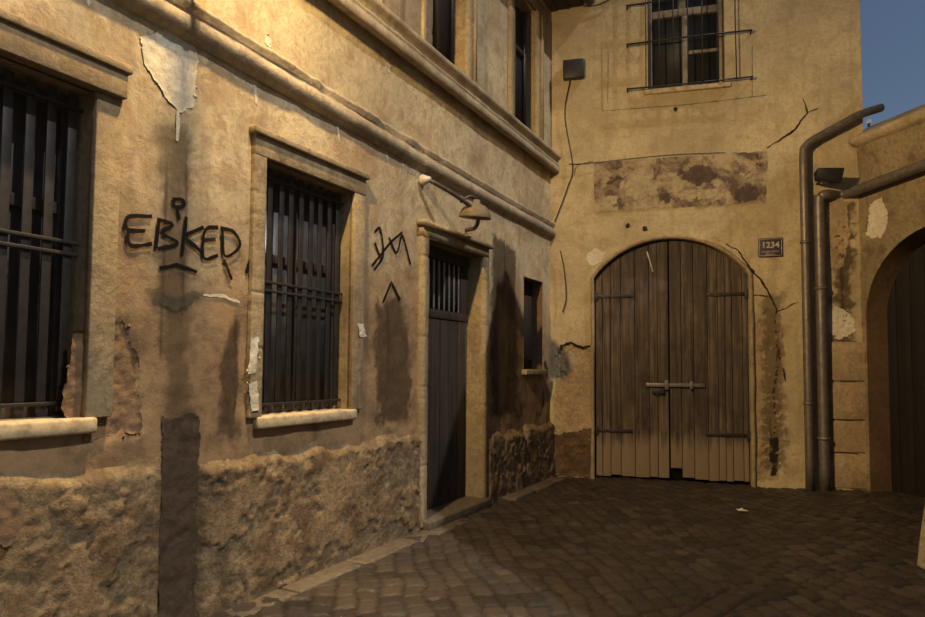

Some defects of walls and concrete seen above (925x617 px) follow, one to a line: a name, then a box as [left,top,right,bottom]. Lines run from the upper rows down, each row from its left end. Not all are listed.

spalling [140,30,199,141]
crack [767,99,818,148]
spalling [61,330,85,418]
spalling [82,320,143,444]
crack [560,342,590,352]
crack [726,243,797,437]
spalling [157,413,201,617]